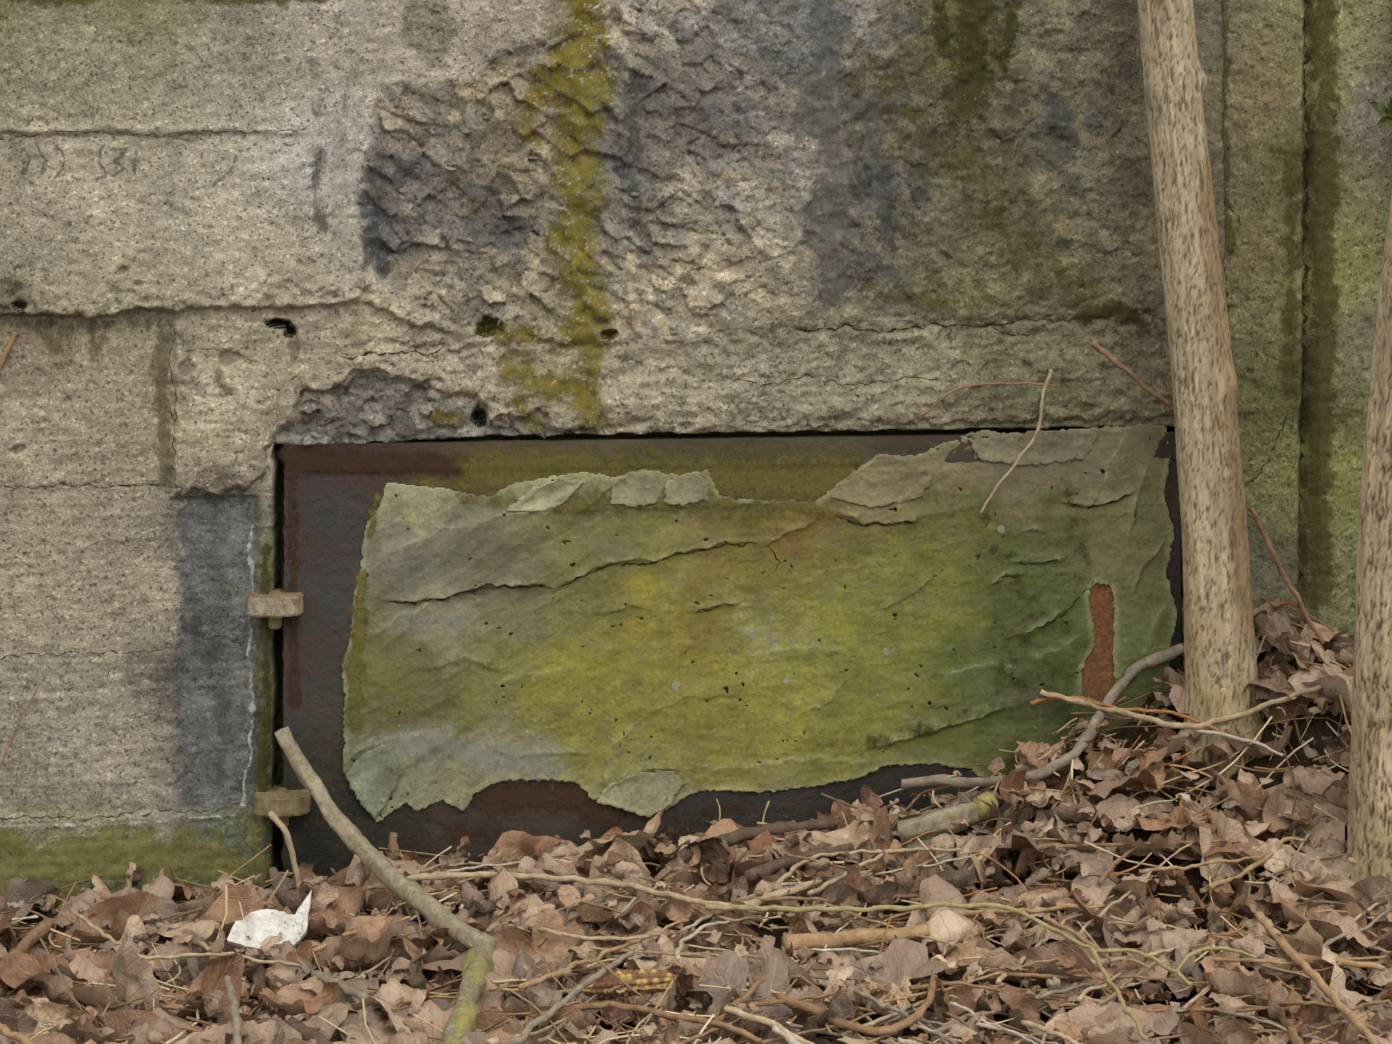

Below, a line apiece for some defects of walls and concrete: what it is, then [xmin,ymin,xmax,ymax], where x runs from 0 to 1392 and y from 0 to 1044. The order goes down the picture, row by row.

water stain [520,49,571,156]
water stain [496,323,538,343]
water stain [247,525,255,591]
corrosion [278,444,469,593]
corrosion [287,616,301,710]
peeling [342,424,1177,822]
corrosion [1076,583,1116,702]